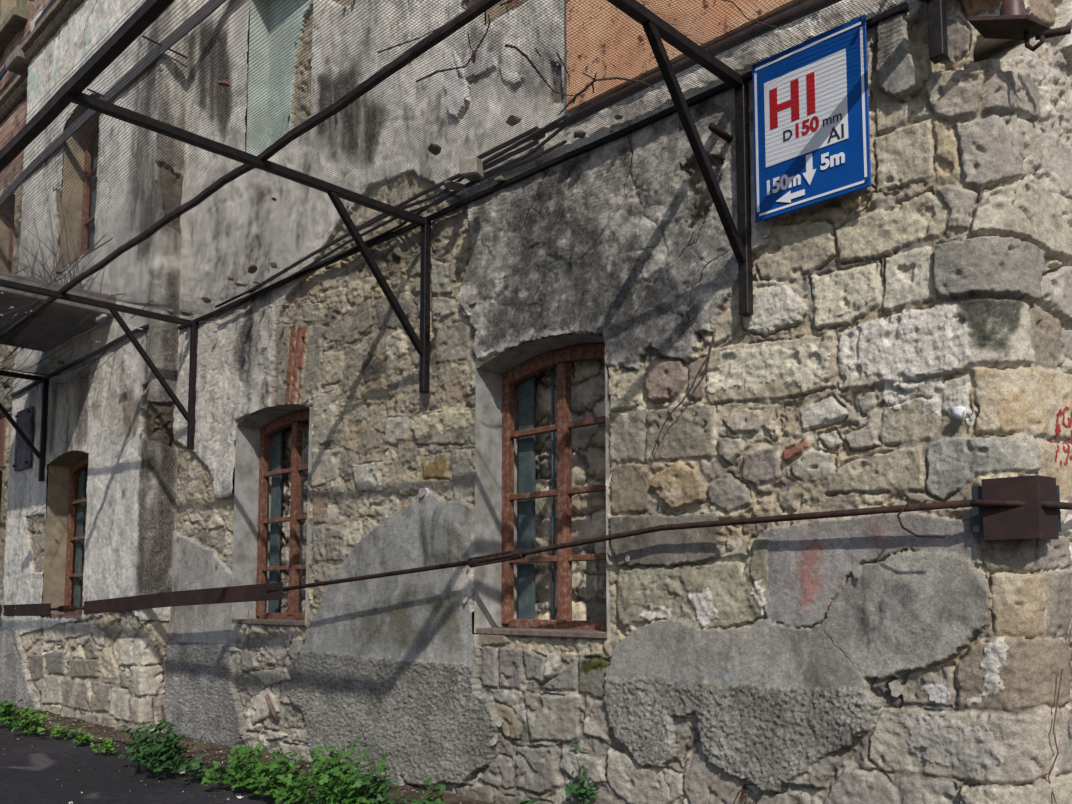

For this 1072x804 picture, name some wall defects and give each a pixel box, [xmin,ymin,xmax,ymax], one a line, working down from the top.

water stain [132,8,185,259]
water stain [184,23,232,133]
water stain [317,64,384,162]
spalling [548,60,564,103]
crack [623,143,729,330]
water stain [123,273,180,594]
spalling [140,382,234,570]
spalling [230,169,491,765]
spalling [605,0,1072,804]
spalling [470,638,704,804]